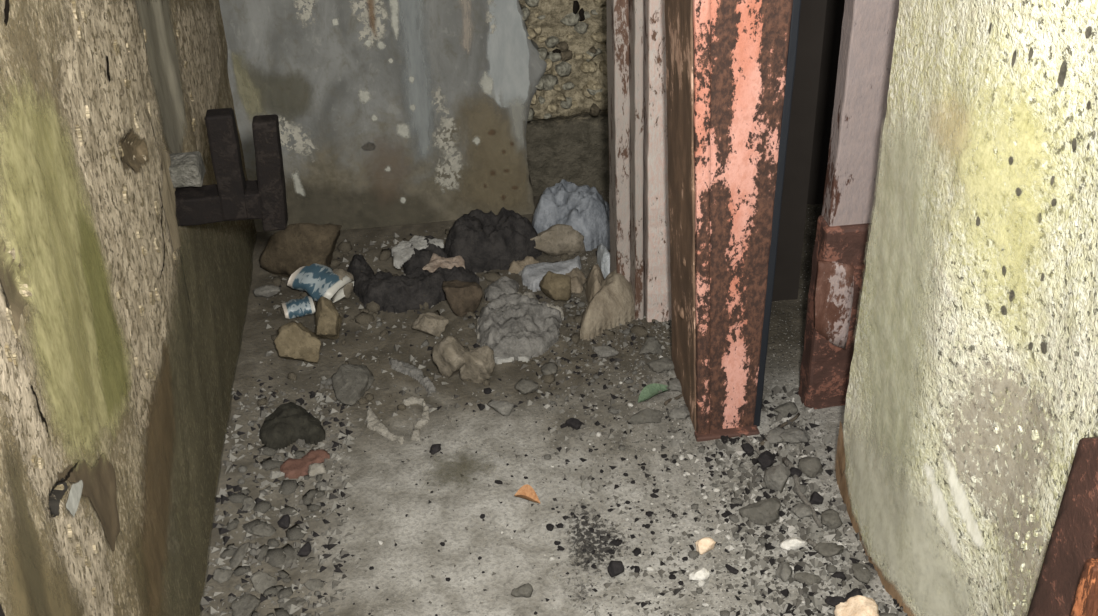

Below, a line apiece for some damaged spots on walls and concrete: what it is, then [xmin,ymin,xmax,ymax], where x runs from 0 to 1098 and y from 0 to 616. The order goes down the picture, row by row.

damp [4,455,82,616]
flaking render [0,234,120,616]
damp [34,114,127,426]
damp [134,231,256,616]
spalling [480,0,608,144]
damp [1008,105,1041,292]